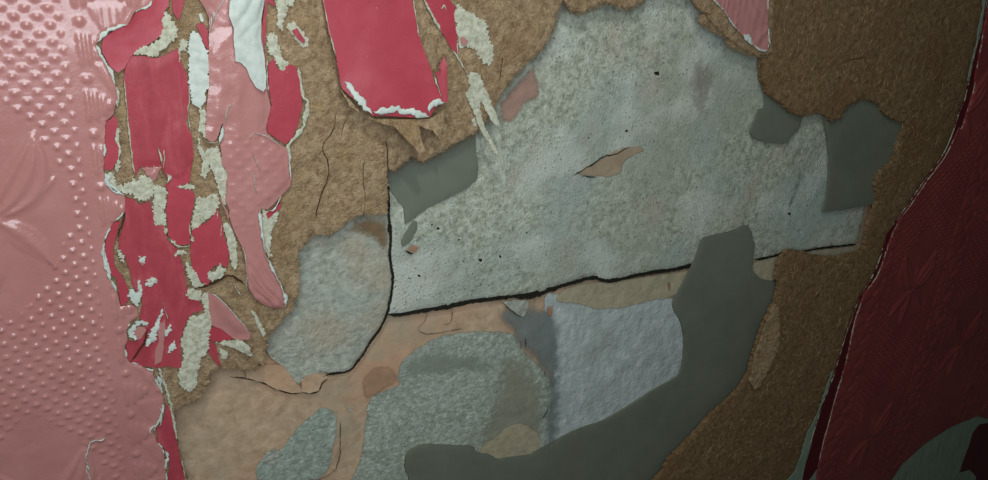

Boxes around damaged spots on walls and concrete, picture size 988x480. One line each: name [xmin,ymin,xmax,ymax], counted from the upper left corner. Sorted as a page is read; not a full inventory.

peeling [262,0,310,162]
crack [315,115,347,220]
peeling [322,0,479,254]
spalling [574,147,643,178]
peeling [749,93,803,144]
peeling [822,99,902,212]
peeling [101,0,229,480]
peeling [261,203,281,258]
crack [323,142,692,377]
crack [805,244,856,252]
peeling [352,225,778,480]
spalling [256,408,341,480]